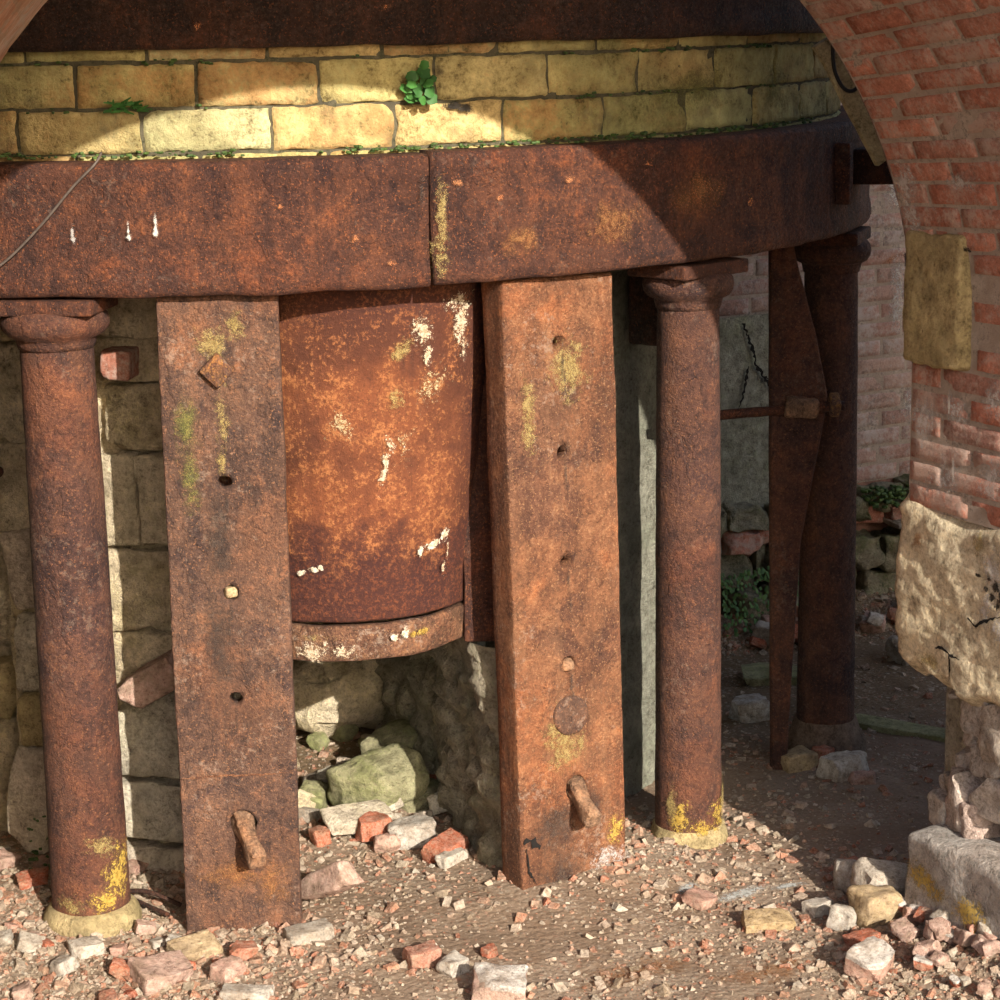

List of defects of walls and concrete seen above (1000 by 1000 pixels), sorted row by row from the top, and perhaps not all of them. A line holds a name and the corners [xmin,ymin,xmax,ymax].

corrosion [434,187,447,266]
corrosion [553,343,582,393]
crack [739,323,768,407]
corrosion [523,385,535,447]
crack [967,617,1000,628]
crack [935,646,959,681]
corrosion [545,725,584,772]